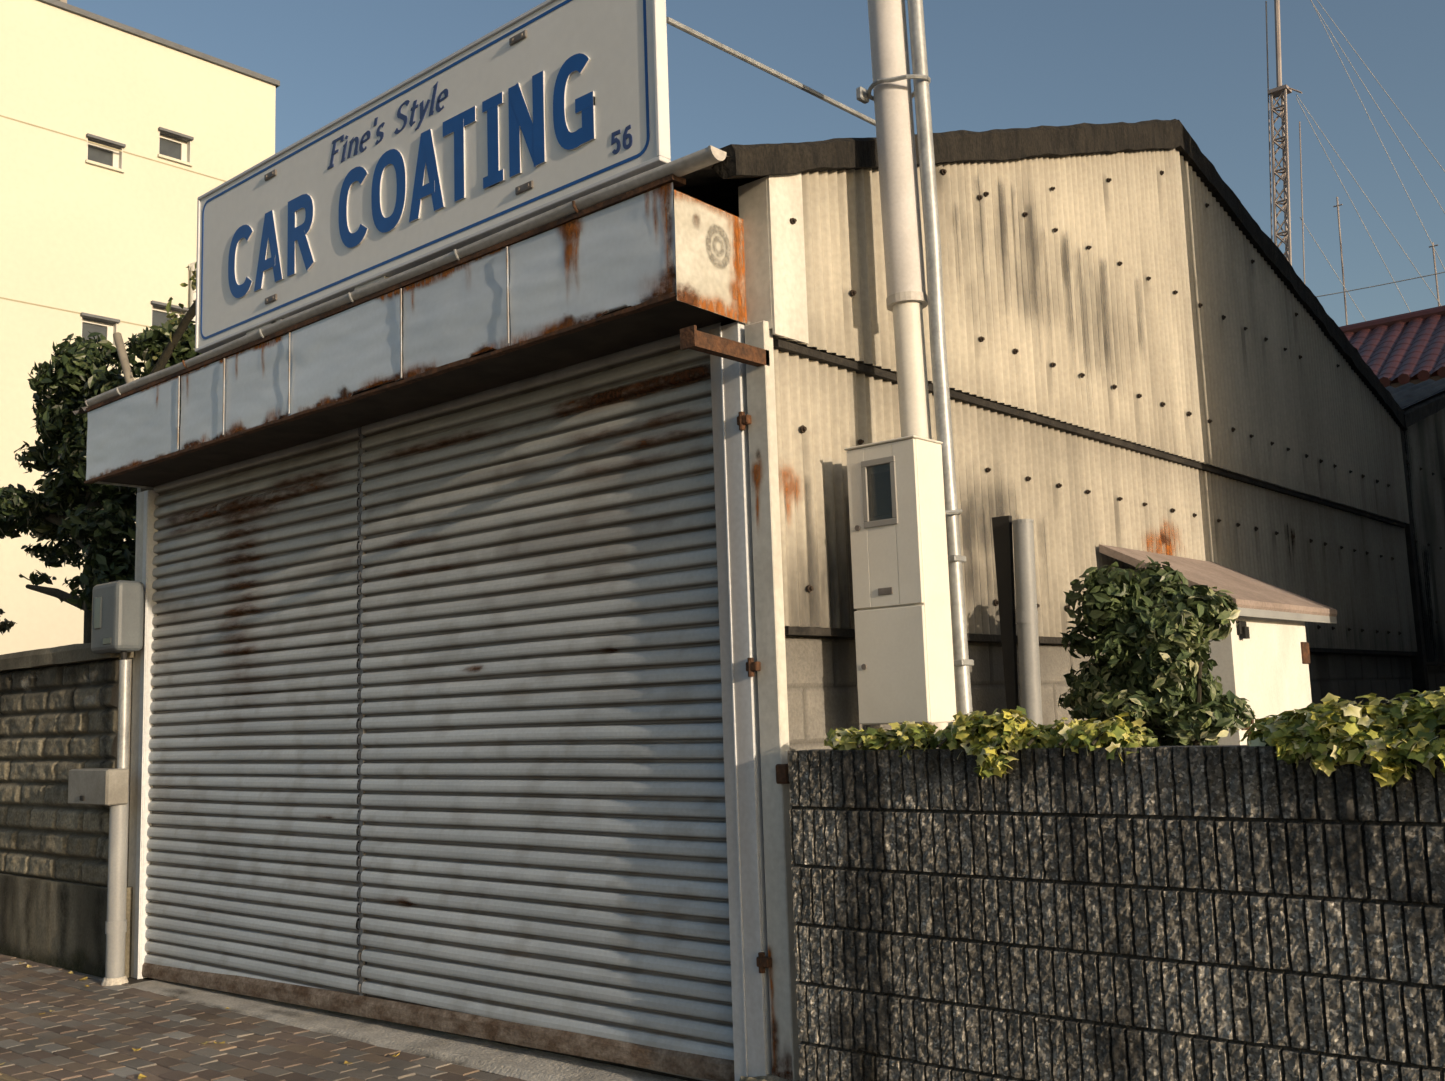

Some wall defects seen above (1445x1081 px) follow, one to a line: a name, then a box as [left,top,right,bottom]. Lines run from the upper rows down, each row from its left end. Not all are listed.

rust [377,246,508,305]
rust [559,219,580,267]
rust [642,183,747,324]
damp [998,185,1036,305]
damp [1065,243,1088,327]
rust [514,311,608,343]
rust [141,336,281,403]
rust [307,367,435,410]
rust [557,365,710,417]
rust [752,453,761,520]
rust [169,473,326,654]
rust [1147,530,1175,556]